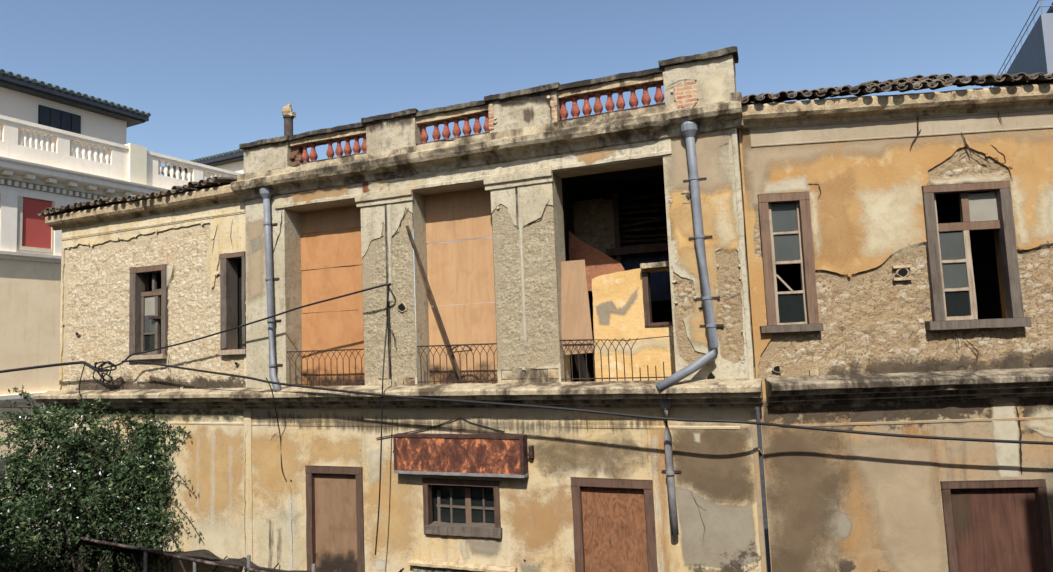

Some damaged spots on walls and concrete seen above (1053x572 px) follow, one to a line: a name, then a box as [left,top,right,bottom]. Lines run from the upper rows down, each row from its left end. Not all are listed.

flaking render [670,73,727,110]
crack [910,117,921,148]
crack [959,132,1006,165]
flaking render [362,208,417,386]
flaking render [492,204,560,383]
flaking render [596,130,1053,381]
water stain [461,539,499,559]
water stain [508,485,573,551]
water stain [534,419,754,572]
water stain [690,398,993,572]